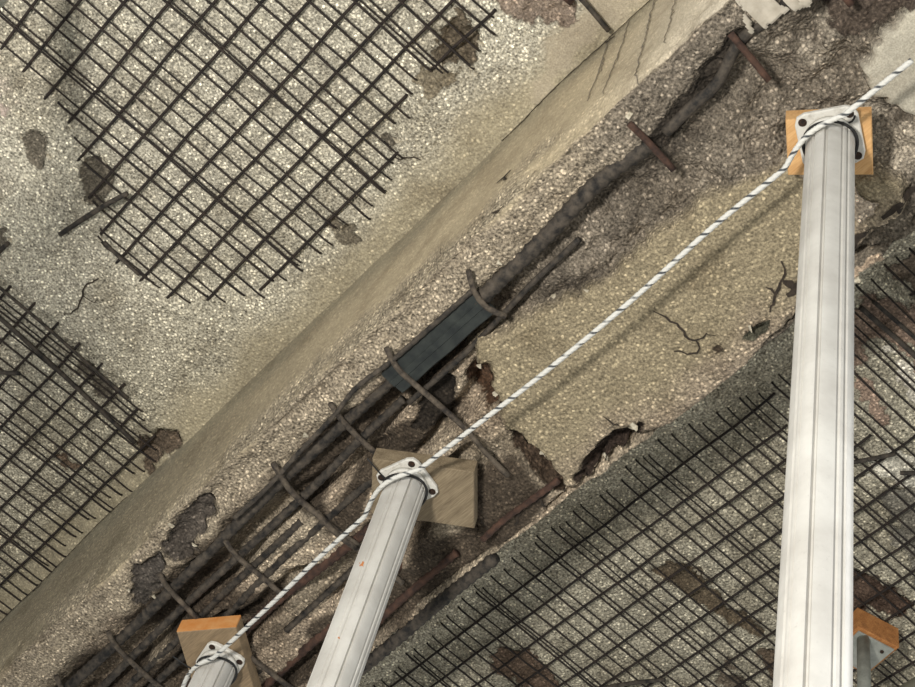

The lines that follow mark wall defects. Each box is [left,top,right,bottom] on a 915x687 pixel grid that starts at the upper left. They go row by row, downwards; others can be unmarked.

spalling [0,285,182,615]
spalling [0,0,578,304]
spalling [49,327,643,687]
spalling [373,373,791,687]
crack [653,311,716,355]
spalling [496,0,915,306]
spalling [742,320,770,341]
crack [766,261,797,313]
spalling [853,372,915,687]
spalling [854,246,915,324]
spalling [854,311,915,392]
spalling [854,353,915,411]